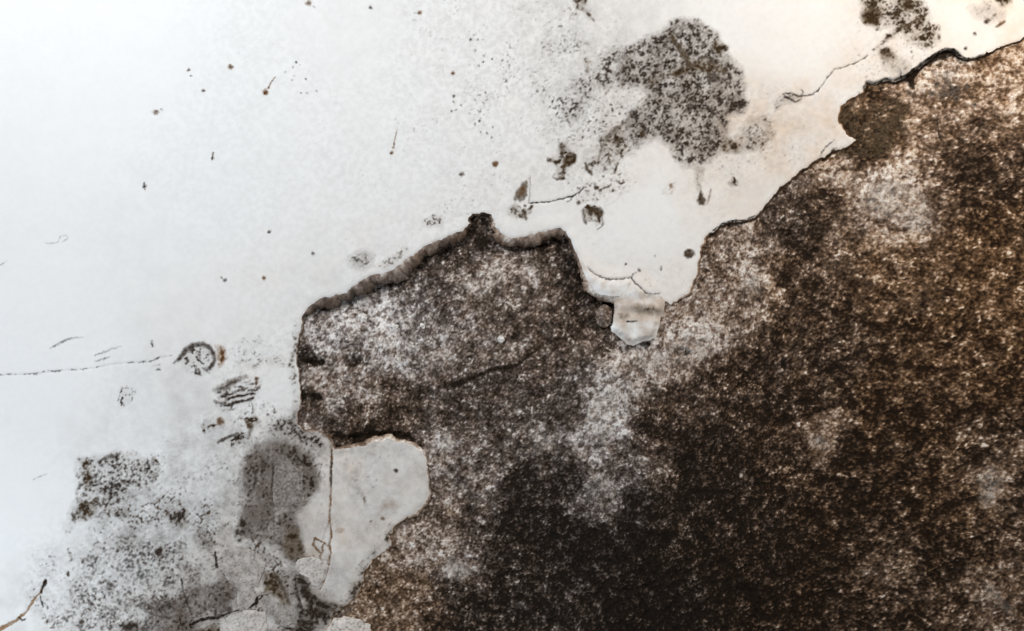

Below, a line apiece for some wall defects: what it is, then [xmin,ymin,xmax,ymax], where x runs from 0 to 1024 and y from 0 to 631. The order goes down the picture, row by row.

crack [786,48,994,102]
damp [862,0,940,69]
damp [547,19,774,224]
spalling [295,37,1024,631]
damp [71,453,158,521]
damp [167,508,189,527]
crack [181,435,333,630]
damp [202,377,375,631]
damp [62,542,235,631]